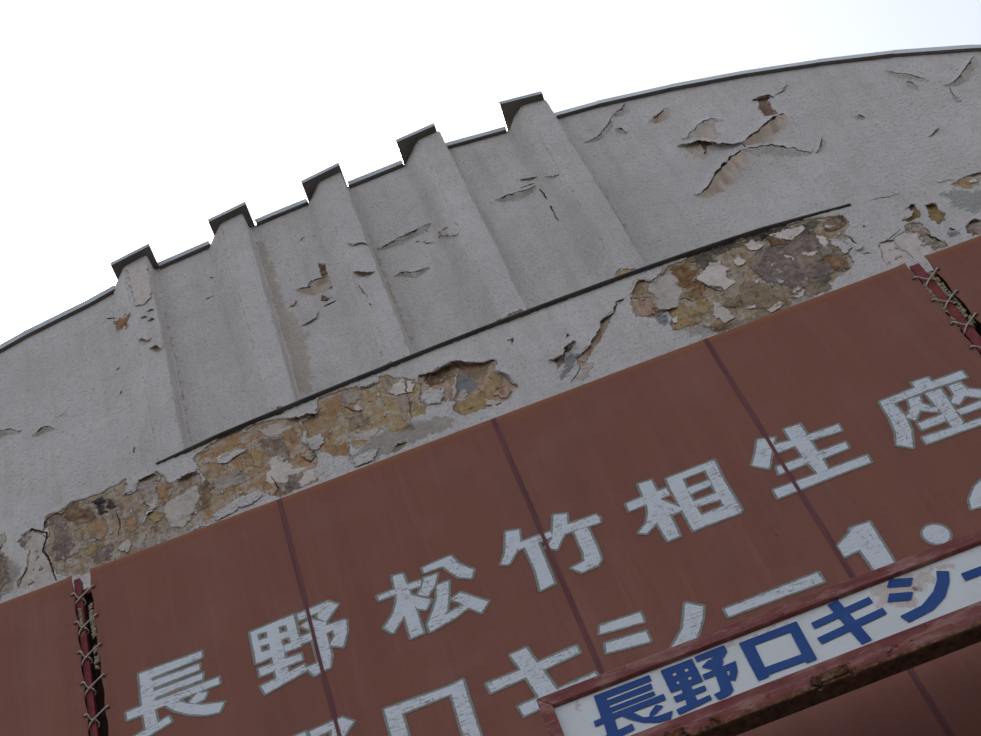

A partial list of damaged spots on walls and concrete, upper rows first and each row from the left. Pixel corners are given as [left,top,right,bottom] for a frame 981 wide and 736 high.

peeling [677,94,814,199]
spalling [289,265,336,307]
peeling [548,215,854,381]
peeling [880,202,948,265]
peeling [966,218,981,236]
peeling [0,359,518,600]